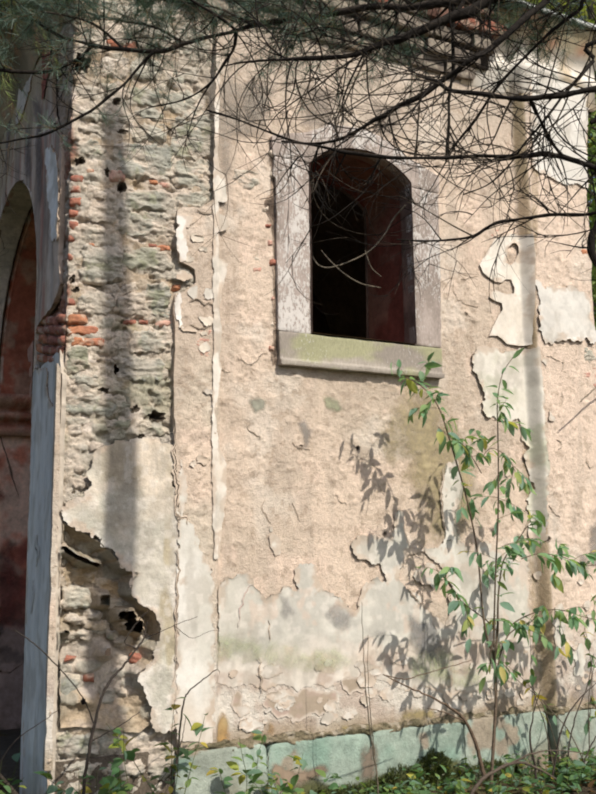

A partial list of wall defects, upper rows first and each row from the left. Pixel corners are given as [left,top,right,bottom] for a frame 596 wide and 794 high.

flaking render [58,0,214,66]
flaking render [15,74,33,126]
flaking render [232,169,260,190]
flaking render [253,137,278,366]
flaking render [21,38,229,794]
flaking render [471,230,596,543]
flaking render [217,460,532,725]
flaking render [231,691,268,732]
peeling [272,765,327,786]
peeling [362,747,377,778]